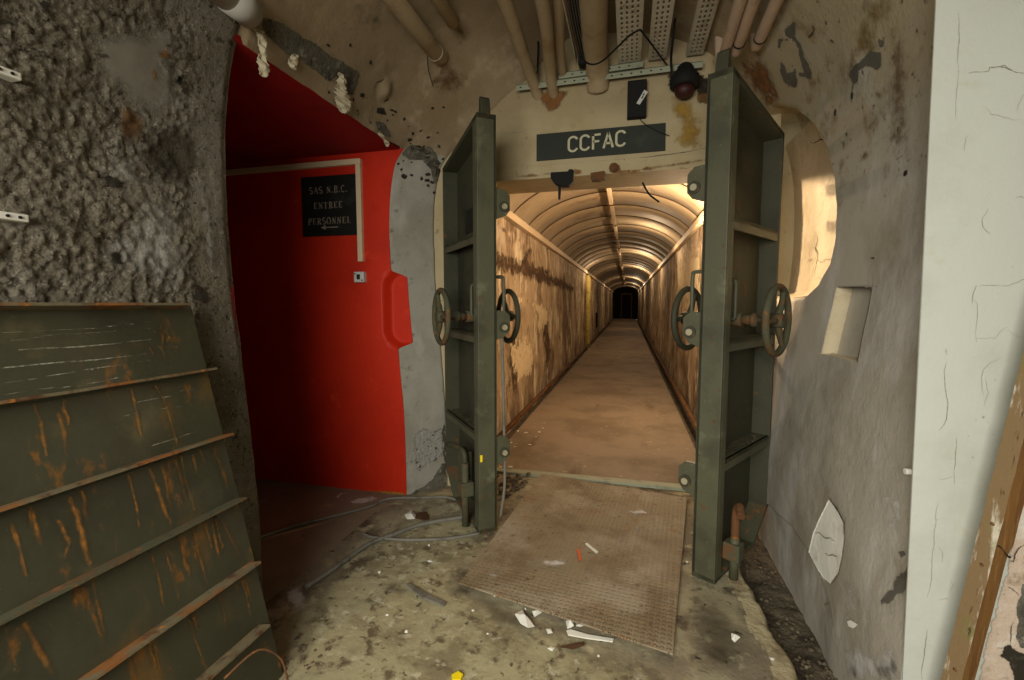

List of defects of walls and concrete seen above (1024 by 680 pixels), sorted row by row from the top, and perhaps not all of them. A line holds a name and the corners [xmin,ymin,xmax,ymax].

spalling [253,19,367,115]
corrosion [541,91,566,110]
water stain [675,103,700,145]
peeling [778,22,811,88]
peeling [849,39,883,100]
crack [956,34,1024,119]
water stain [509,330,519,390]
crack [972,279,1024,405]
peeling [881,551,907,605]
crack [927,503,954,600]